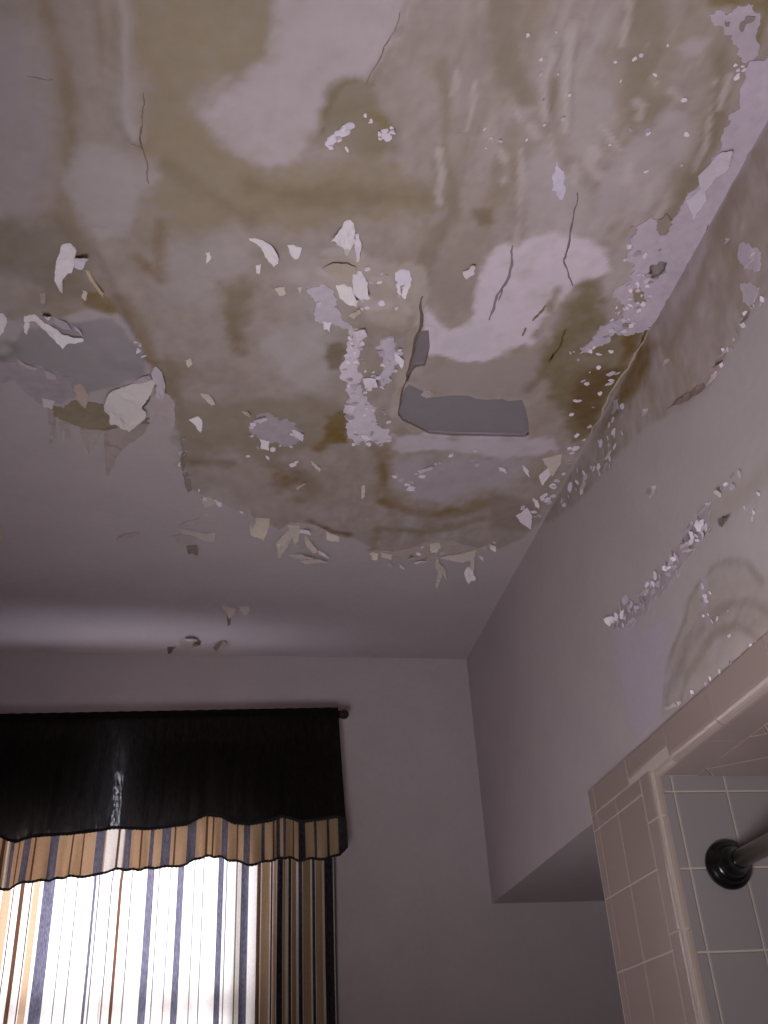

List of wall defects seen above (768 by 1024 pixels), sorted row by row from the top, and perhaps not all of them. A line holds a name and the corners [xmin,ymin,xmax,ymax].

crack [365,12,400,86]
crack [131,93,149,184]
peeling [325,113,396,153]
peeling [24,291,84,349]
peeling [54,243,104,301]
peeling [249,238,302,274]
damp [0,0,768,555]
spalling [275,220,535,467]
crack [489,245,513,320]
crack [563,193,578,286]
peeling [569,3,768,416]
peeling [47,367,176,476]